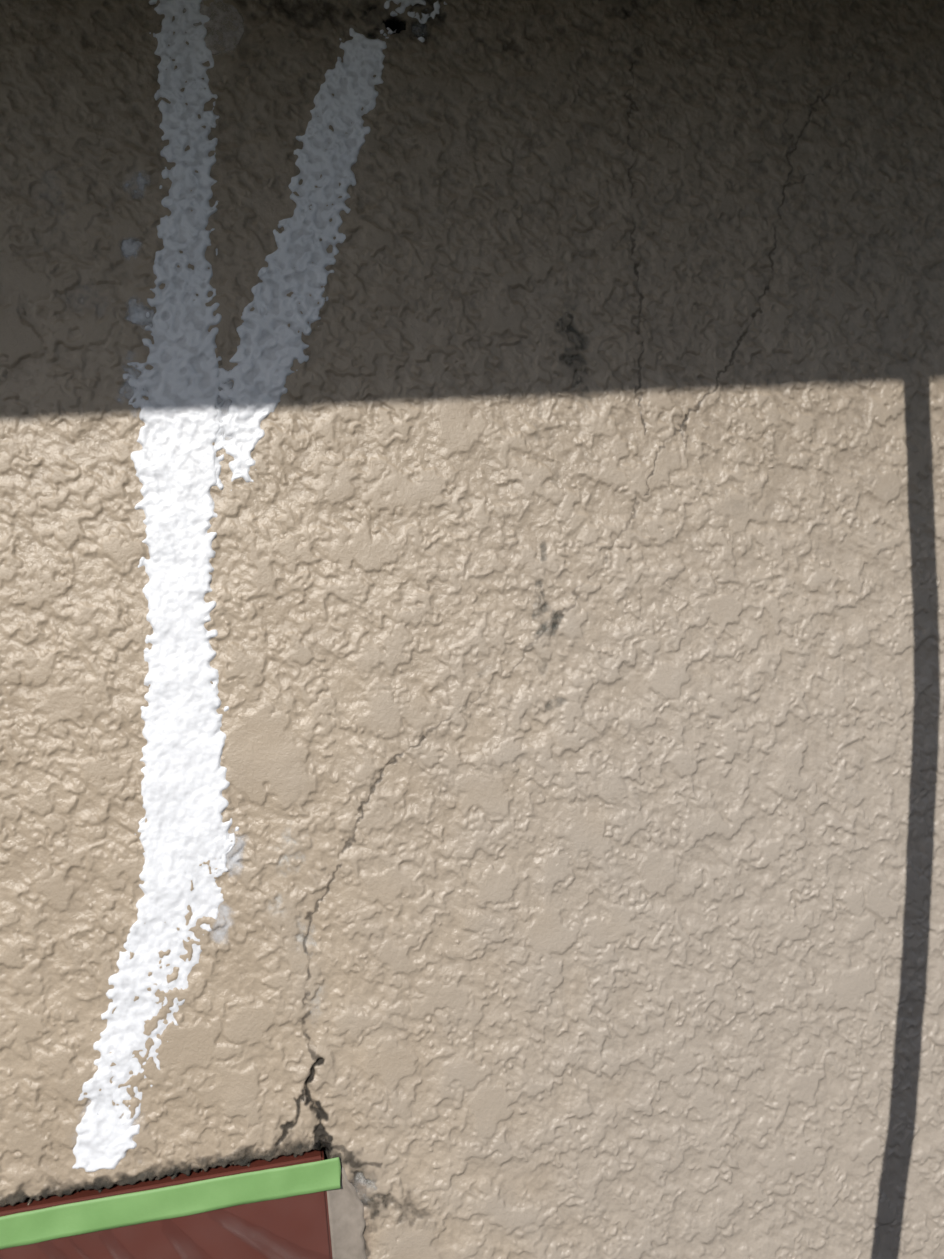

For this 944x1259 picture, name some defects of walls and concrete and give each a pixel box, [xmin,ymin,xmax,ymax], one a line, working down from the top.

crack [275,1058,344,1151]